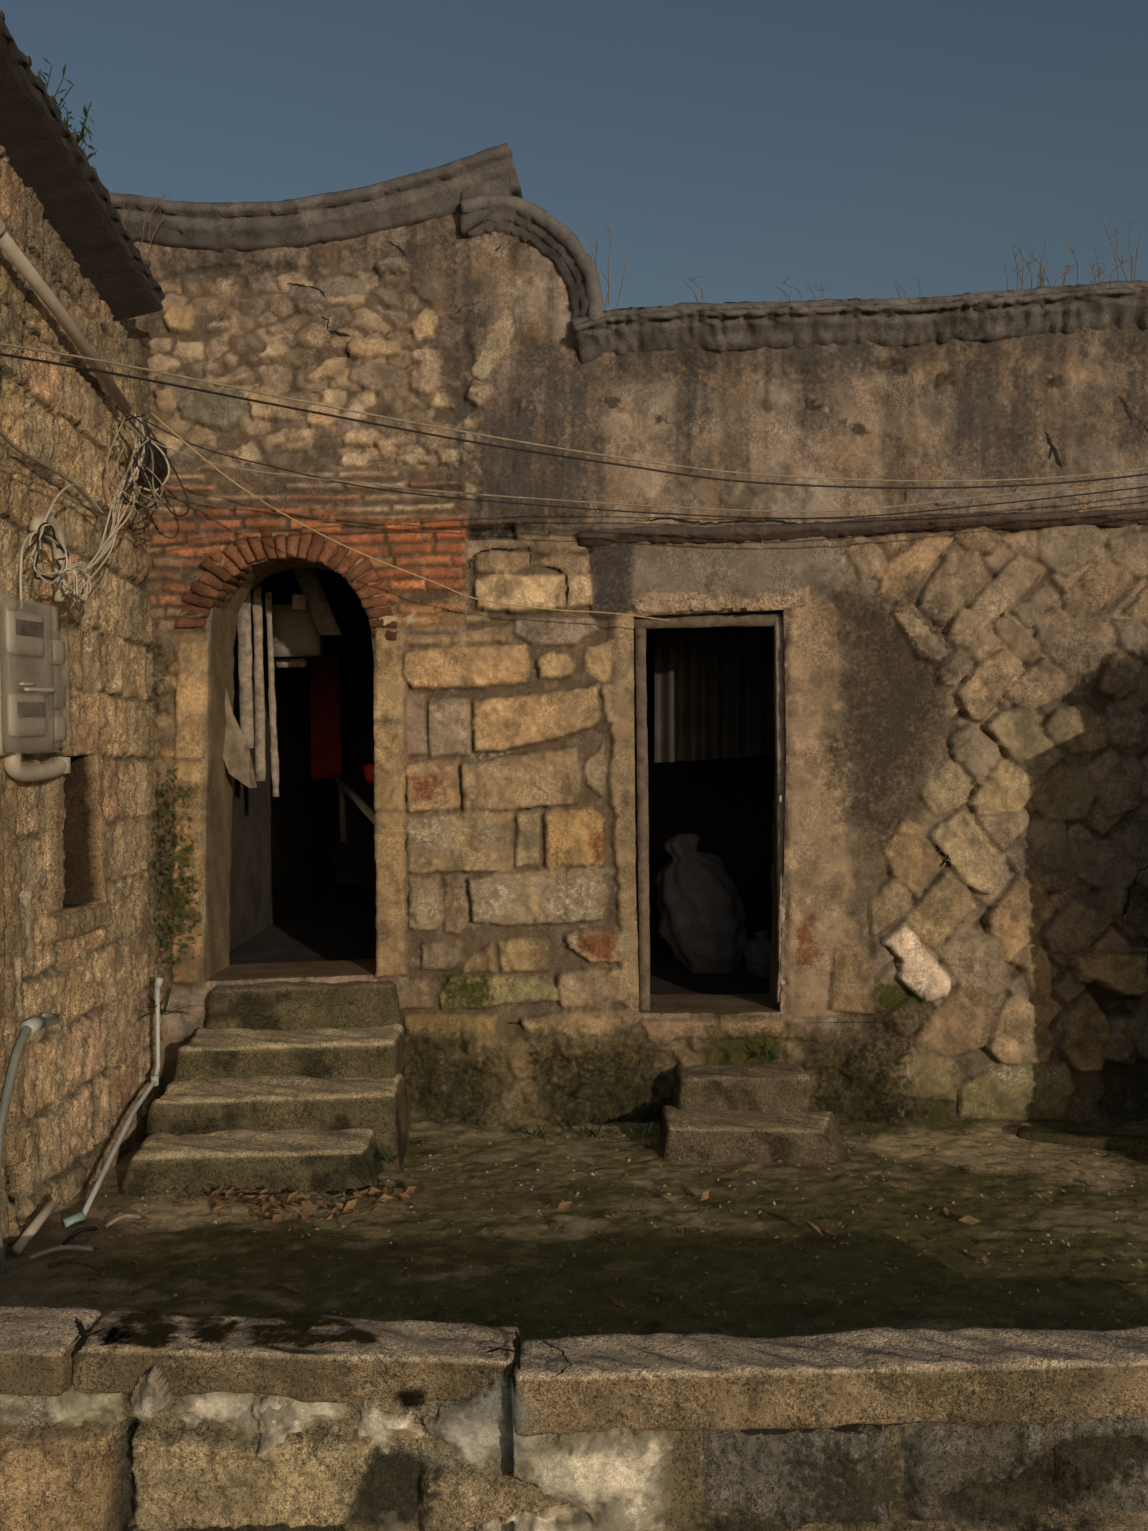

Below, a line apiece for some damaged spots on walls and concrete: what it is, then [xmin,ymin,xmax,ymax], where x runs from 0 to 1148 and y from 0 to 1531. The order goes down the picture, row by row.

crack [1118,395,1148,432]
crack [1045,432,1062,467]
damp [351,1455,441,1530]